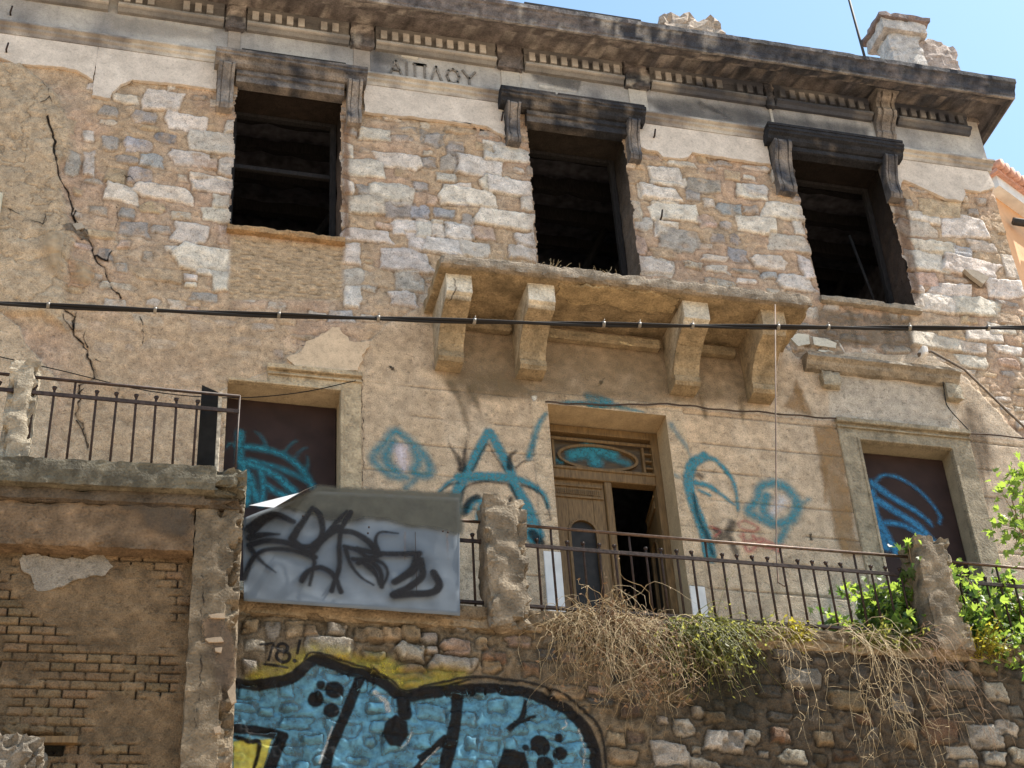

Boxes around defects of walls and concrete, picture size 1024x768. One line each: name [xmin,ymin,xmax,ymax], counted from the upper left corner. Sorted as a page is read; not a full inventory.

crack [8,84,121,299]
flaking render [898,160,995,203]
spalling [60,222,89,247]
spalling [962,269,989,288]
flaking render [286,327,369,371]
crack [63,310,100,447]
flaking render [19,554,113,591]